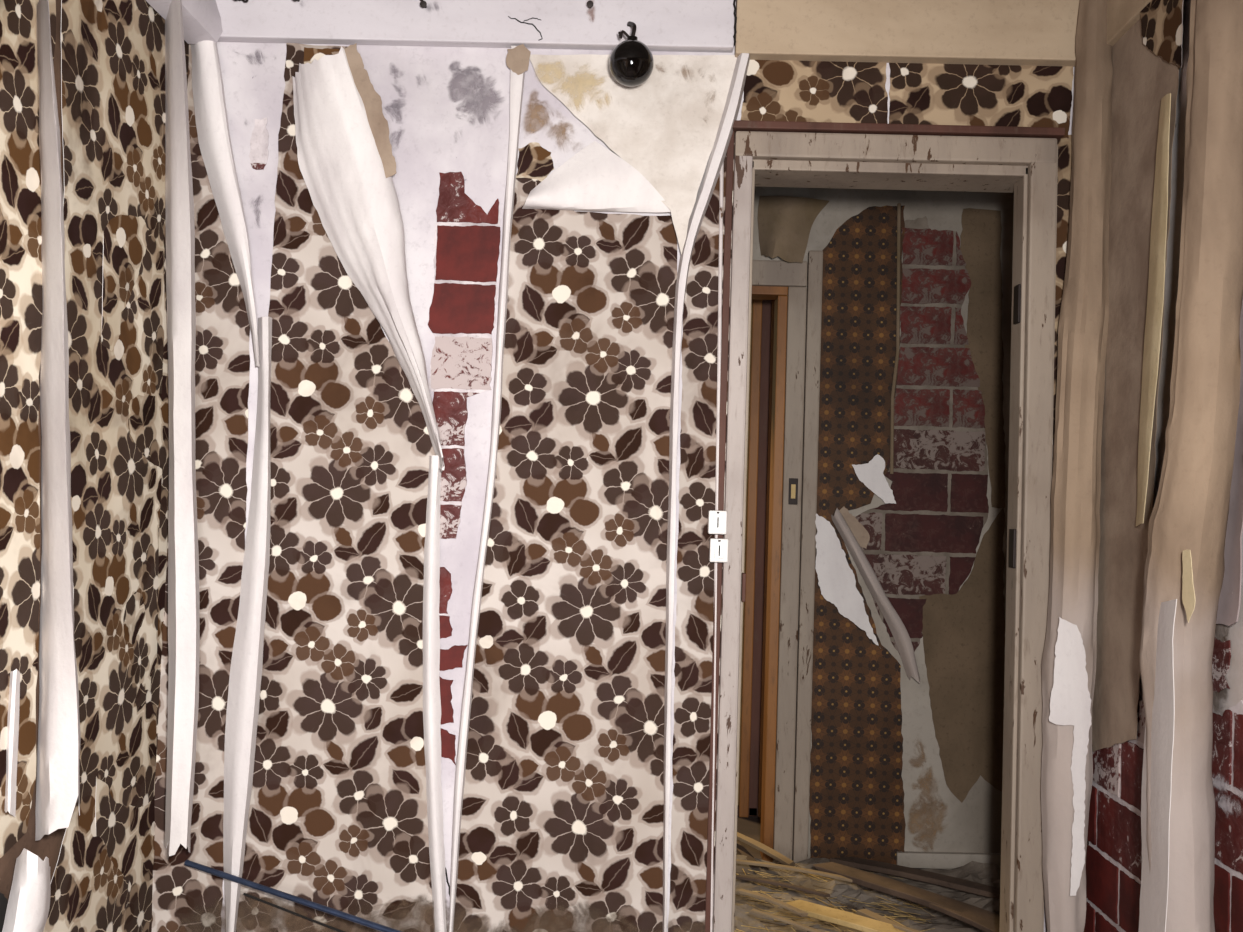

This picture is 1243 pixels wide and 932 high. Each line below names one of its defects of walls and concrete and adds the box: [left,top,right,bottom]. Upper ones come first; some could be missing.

flaking render [249,118,269,170]
leakage [449,64,499,121]
flaking render [428,172,501,539]
flaking render [856,216,989,655]
peeling [1212,299,1243,693]
flaking render [439,567,468,765]
leakage [909,743,944,849]
flaking render [1084,698,1145,932]
flaking render [1212,700,1243,932]